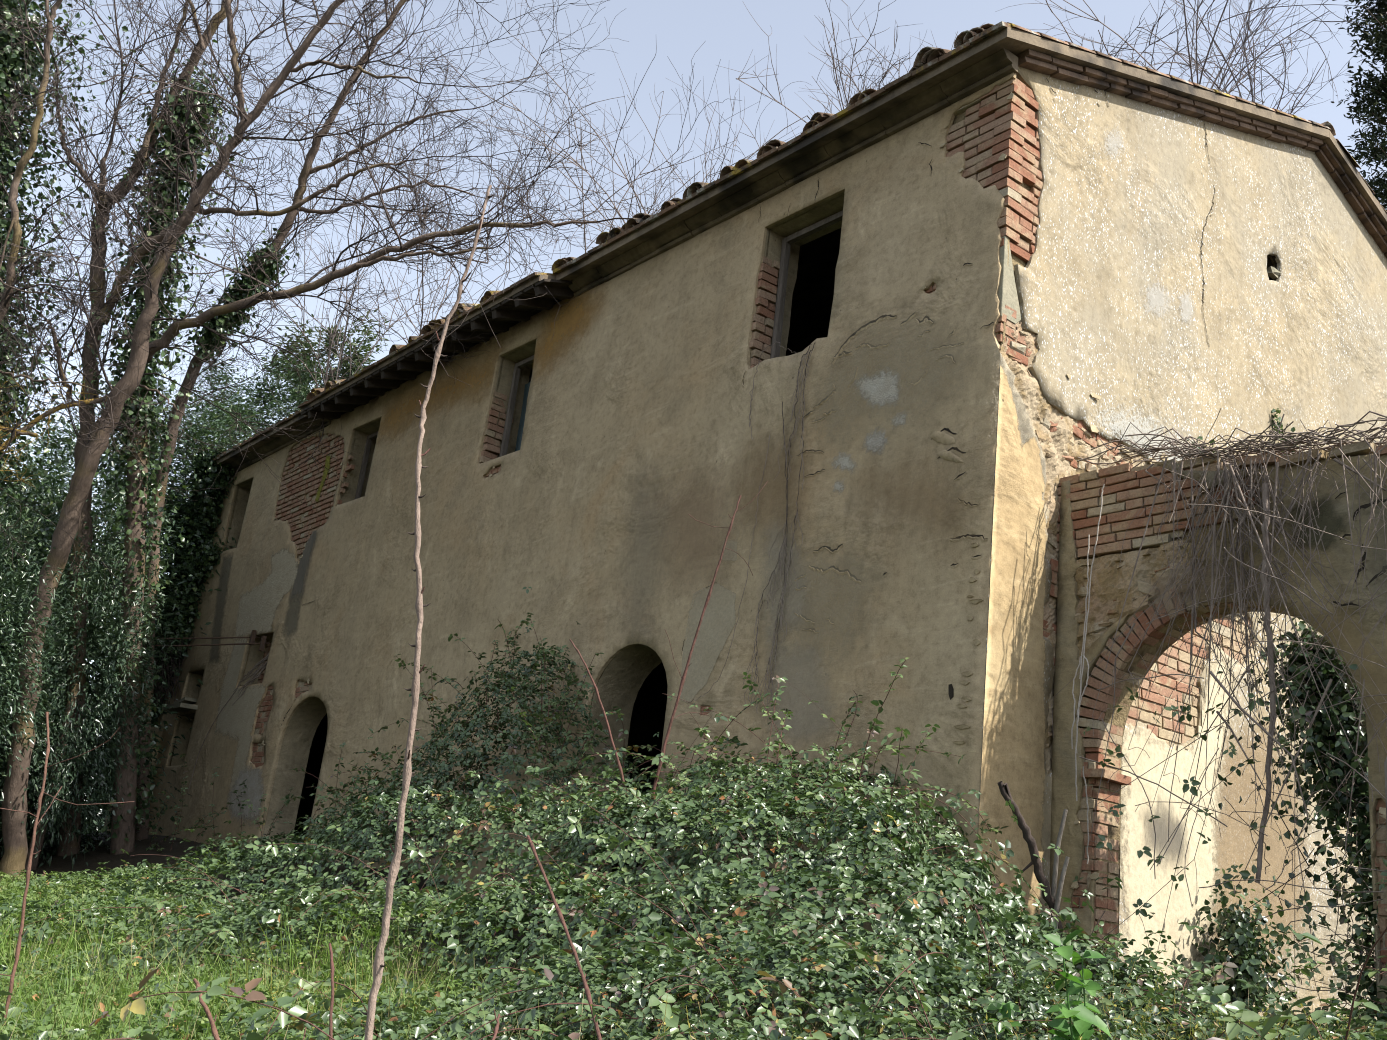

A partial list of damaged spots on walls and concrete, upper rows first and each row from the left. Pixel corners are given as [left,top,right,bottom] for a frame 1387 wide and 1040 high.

flaking render [939,78,1043,263]
crack [1199,120,1216,347]
crack [796,312,994,479]
flaking render [1056,445,1261,560]
flaking render [215,433,355,819]
leakage [1148,810,1184,858]